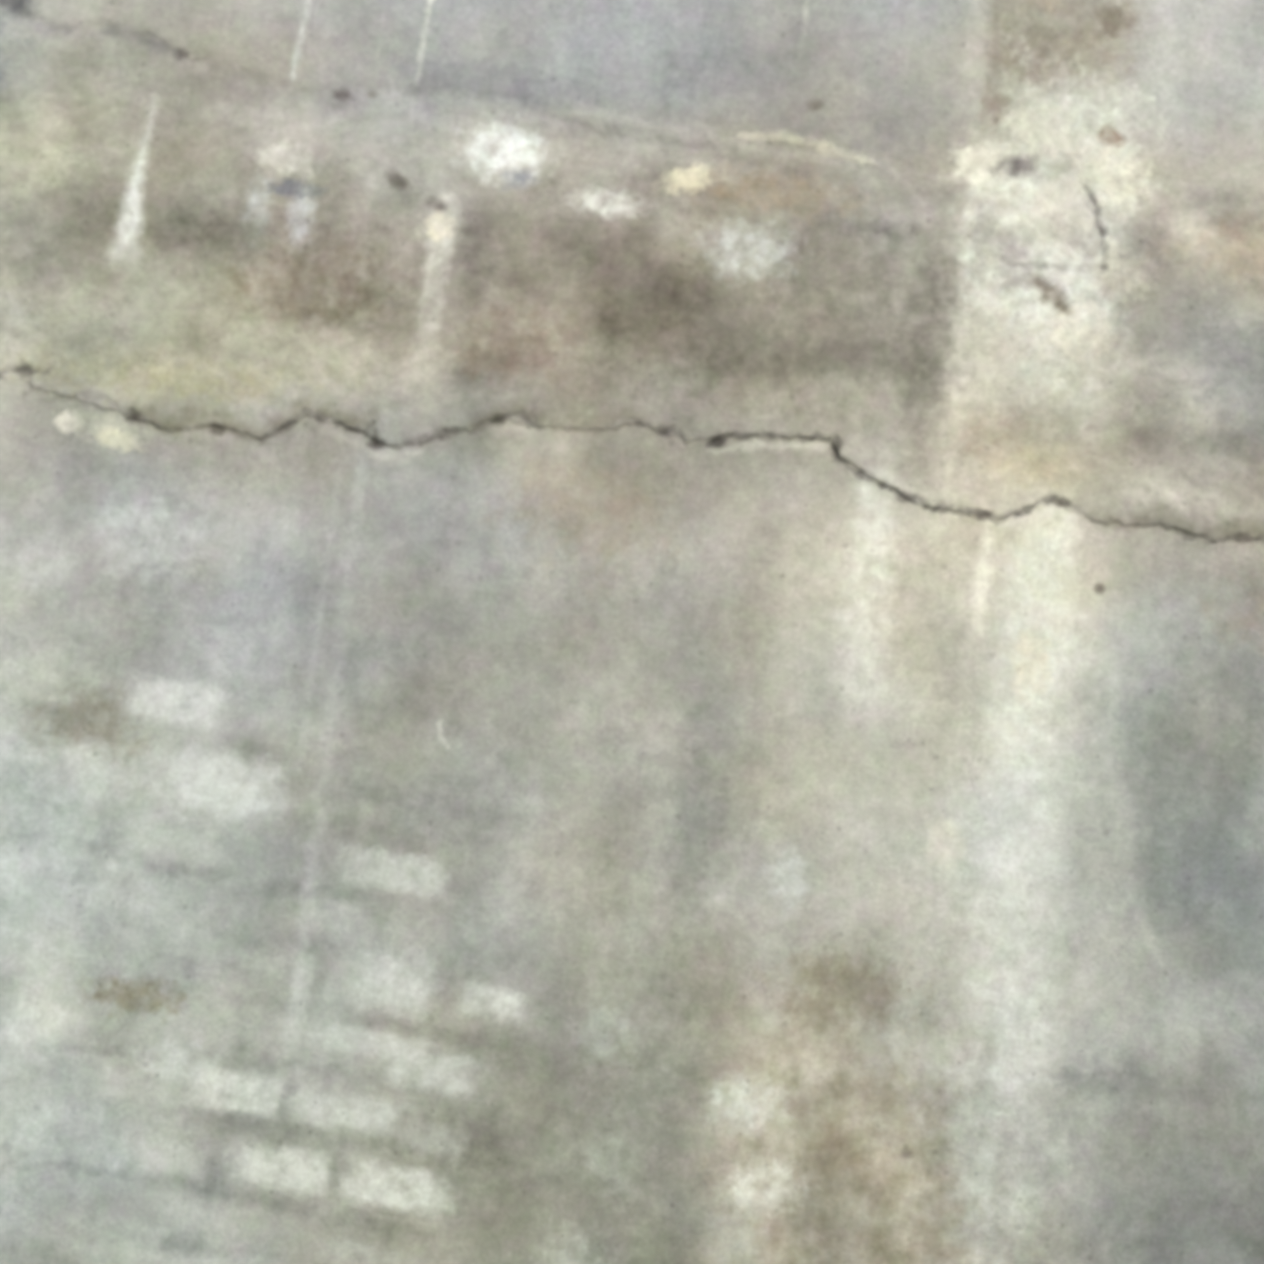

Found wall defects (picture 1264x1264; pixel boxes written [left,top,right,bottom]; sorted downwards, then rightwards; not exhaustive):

crack [0,0,210,66]
leakage [100,91,163,277]
crack [248,67,356,101]
crack [401,70,742,159]
leakage [407,189,467,386]
leakage [615,199,959,430]
crack [0,357,1264,549]